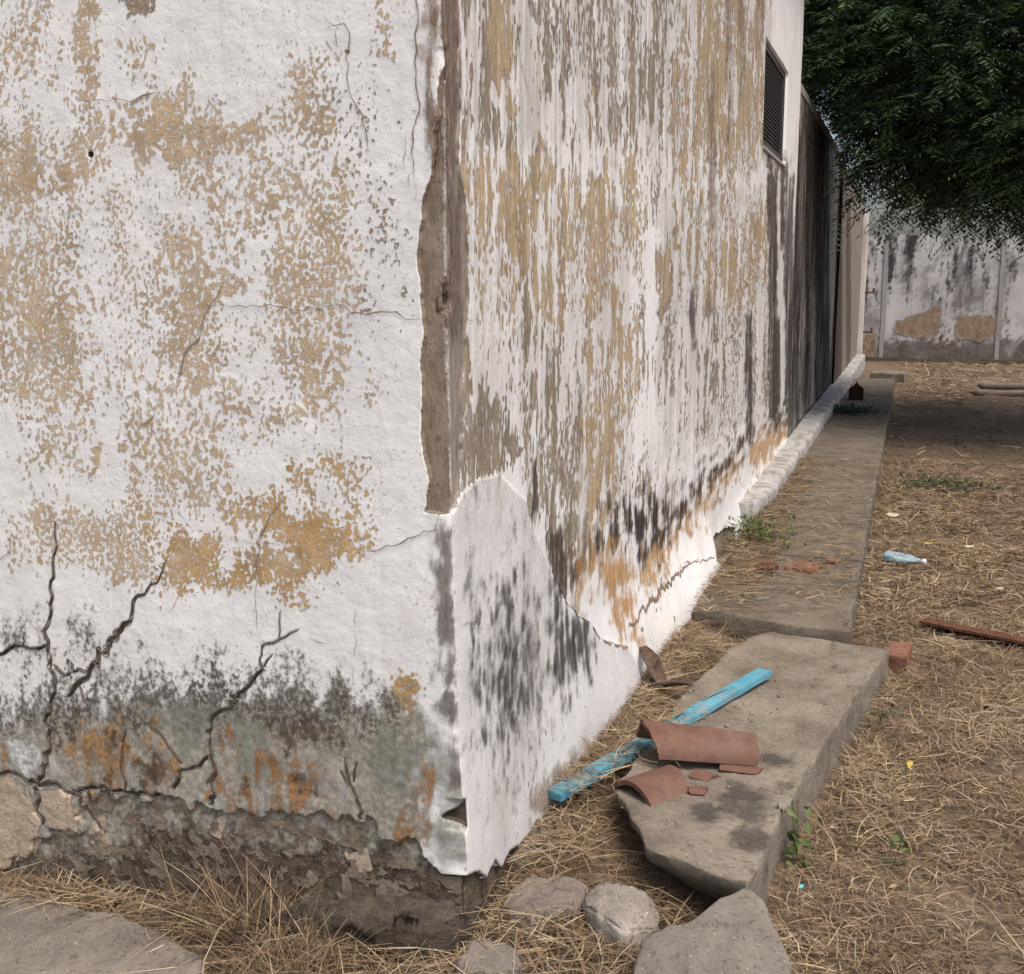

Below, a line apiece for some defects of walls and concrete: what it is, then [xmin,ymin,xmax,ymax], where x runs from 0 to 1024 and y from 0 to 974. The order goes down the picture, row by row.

spalling [0,0,776,611]
damp [865,234,918,307]
peeling [894,304,942,340]
damp [875,314,1024,360]
peeling [954,314,1004,342]
damp [465,97,851,814]
crack [0,499,357,828]
crack [363,516,439,552]
damp [431,525,458,723]
crack [593,557,715,649]
damp [0,601,478,873]
spalling [0,776,521,920]